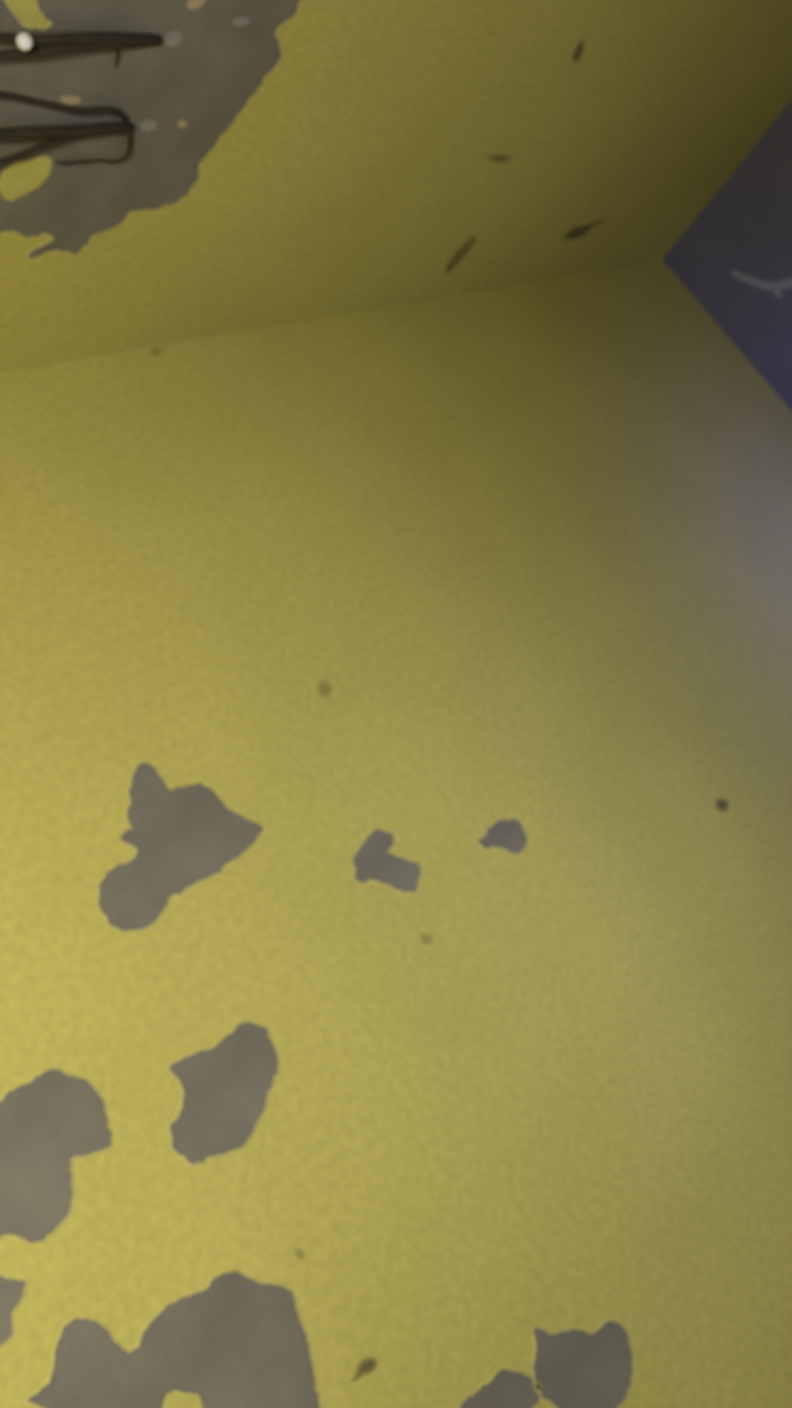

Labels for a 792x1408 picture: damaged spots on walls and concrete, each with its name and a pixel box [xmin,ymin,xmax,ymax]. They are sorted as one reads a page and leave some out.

peeling [0,0,301,260]
peeling [96,761,265,933]
peeling [351,828,422,895]
peeling [475,818,528,856]
peeling [0,1067,114,1246]
peeling [166,1020,281,1167]
peeling [0,1272,28,1349]
peeling [24,1268,322,1408]
peeling [456,1318,634,1408]